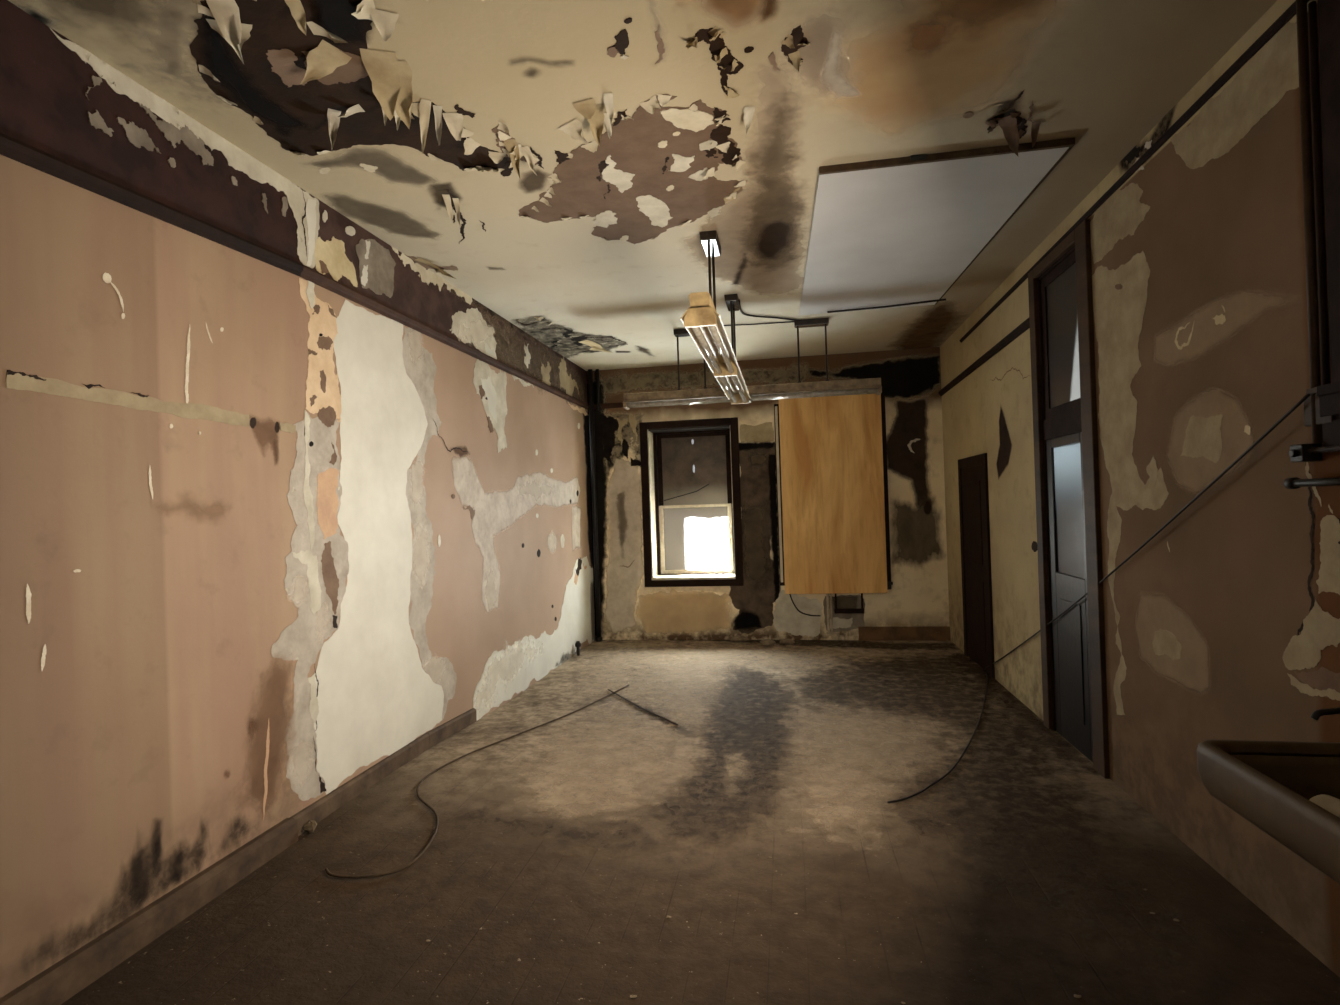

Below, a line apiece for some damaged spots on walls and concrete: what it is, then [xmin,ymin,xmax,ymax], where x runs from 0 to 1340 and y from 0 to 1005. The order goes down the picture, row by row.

spalling [189,0,755,245]
spalling [768,25,811,71]
water stain [686,0,1046,293]
spalling [963,89,1041,156]
flaking render [49,27,444,795]
peeling [392,247,534,453]
water stain [741,302,959,565]
peeling [1090,183,1253,715]
flaking render [473,460,643,720]
peeling [1282,515,1340,701]
water stain [222,661,291,850]
water stain [21,822,207,973]